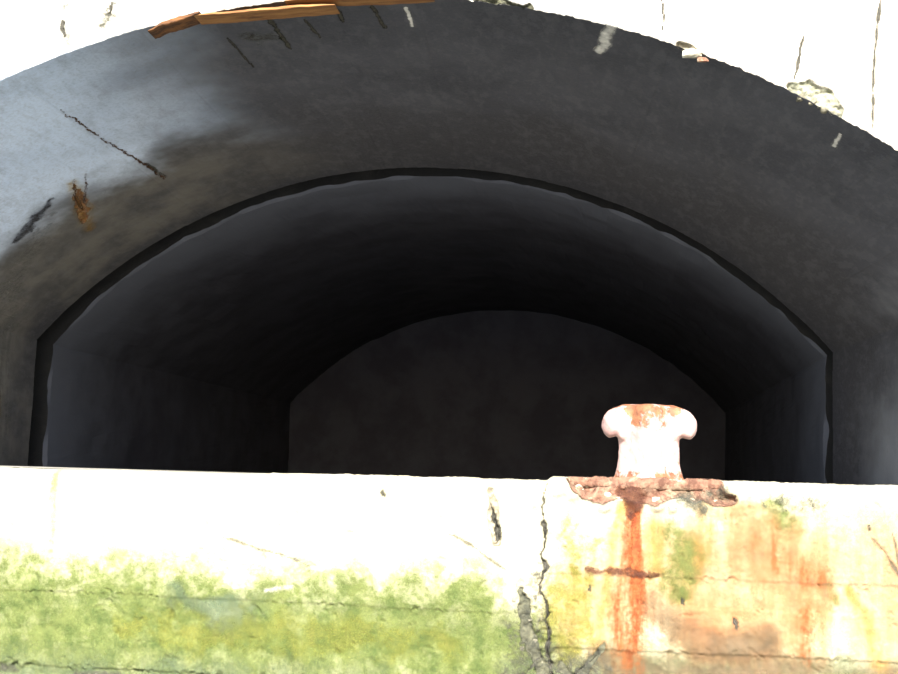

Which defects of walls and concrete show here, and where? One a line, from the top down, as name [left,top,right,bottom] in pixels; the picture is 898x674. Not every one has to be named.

crack [60,109,166,179]
spalling [787,79,844,118]
crack [872,0,881,123]
crack [522,483,553,674]
rust [587,498,657,614]